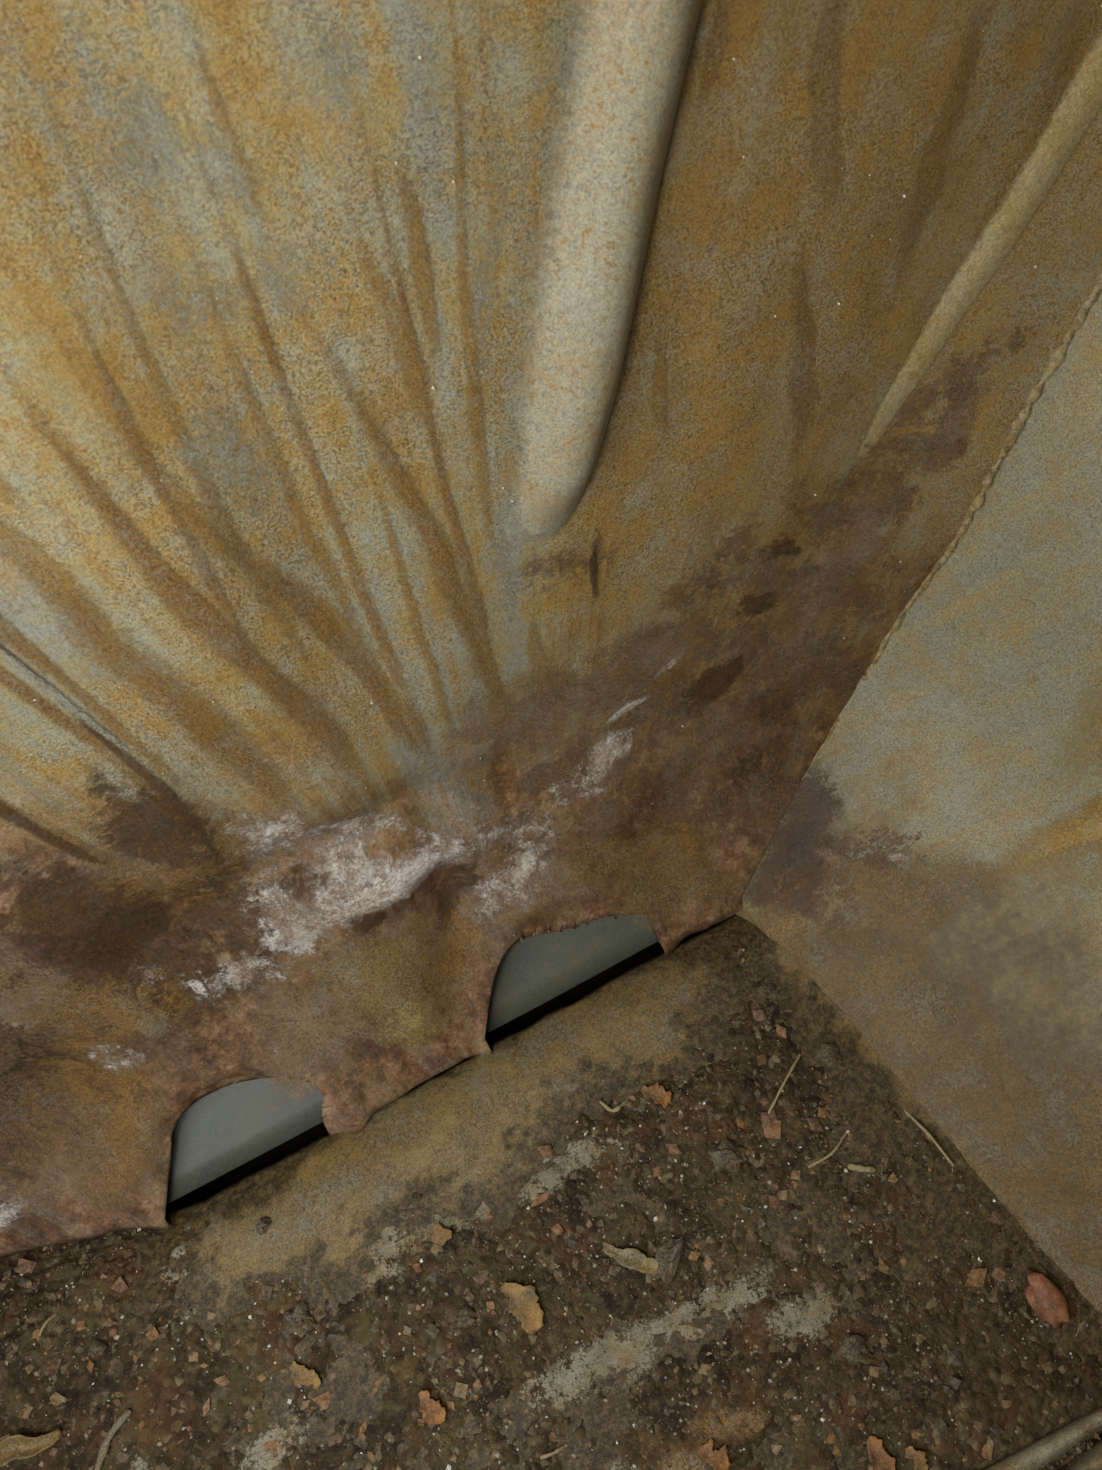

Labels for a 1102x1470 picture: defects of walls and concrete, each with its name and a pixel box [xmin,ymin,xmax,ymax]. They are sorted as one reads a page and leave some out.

rust [2,175,428,780]
rust [343,177,497,669]
rust [455,96,496,548]
rust [427,1223,452,1246]
rust [640,1081,672,1108]